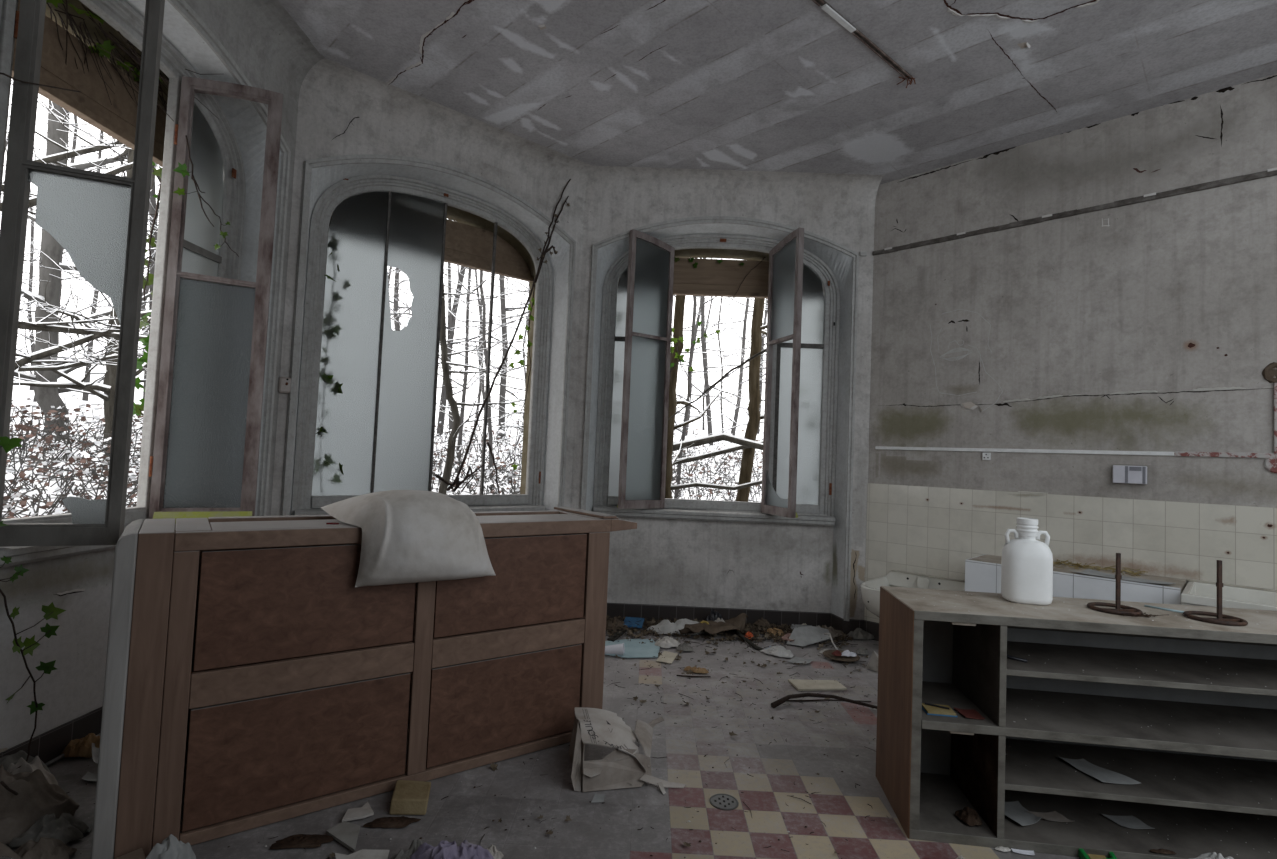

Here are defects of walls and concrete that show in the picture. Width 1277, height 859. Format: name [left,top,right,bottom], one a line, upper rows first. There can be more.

crack [386,0,474,86]
crack [944,0,1101,134]
crack [1131,75,1277,145]
crack [899,147,1015,182]
crack [880,385,1274,407]
water stain [1001,384,1277,508]
water stain [607,380,982,619]